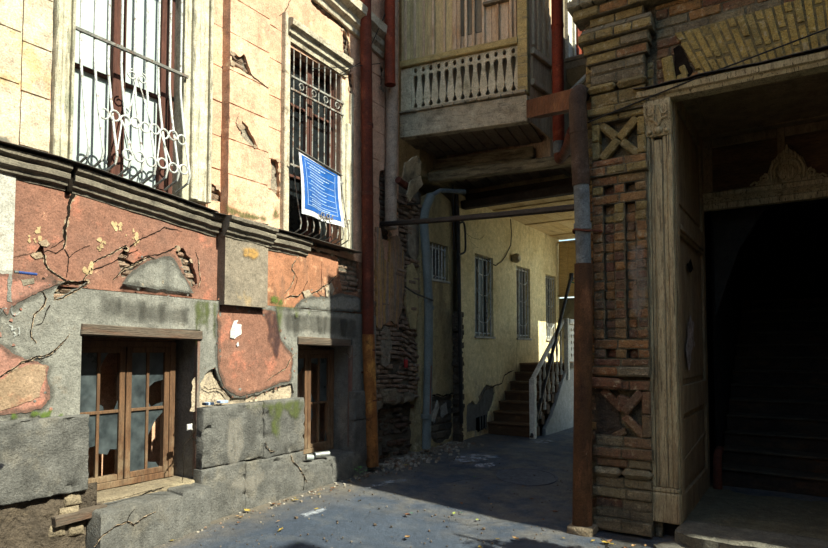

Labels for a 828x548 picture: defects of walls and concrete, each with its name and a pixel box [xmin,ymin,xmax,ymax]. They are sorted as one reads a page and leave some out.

spalling [230,50,249,74]
spalling [237,123,257,149]
peeling [0,261,94,322]
crack [0,170,201,377]
spalling [111,221,143,278]
spalling [175,245,195,287]
crack [284,256,339,299]
peeling [0,332,53,415]
peeling [190,298,297,412]
spalling [431,311,495,443]
crack [94,419,196,547]